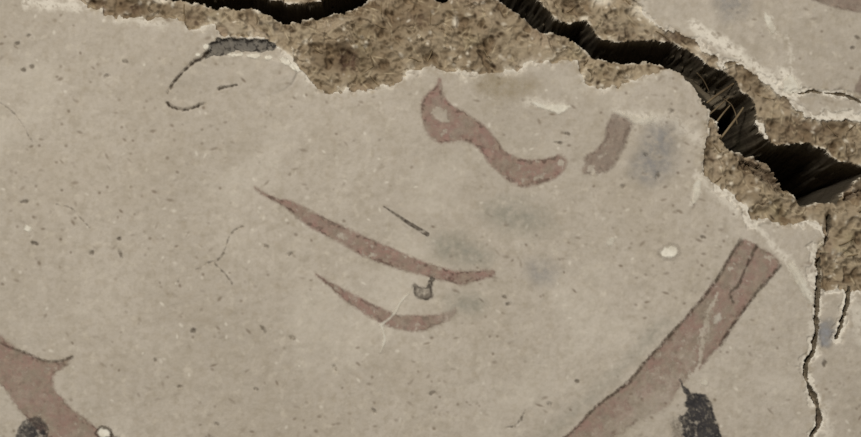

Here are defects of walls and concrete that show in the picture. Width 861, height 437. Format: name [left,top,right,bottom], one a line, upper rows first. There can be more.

crack [166,0,368,25]
spalling [81,0,665,94]
spalling [532,0,861,292]
crack [499,0,861,437]
spalling [789,263,813,302]